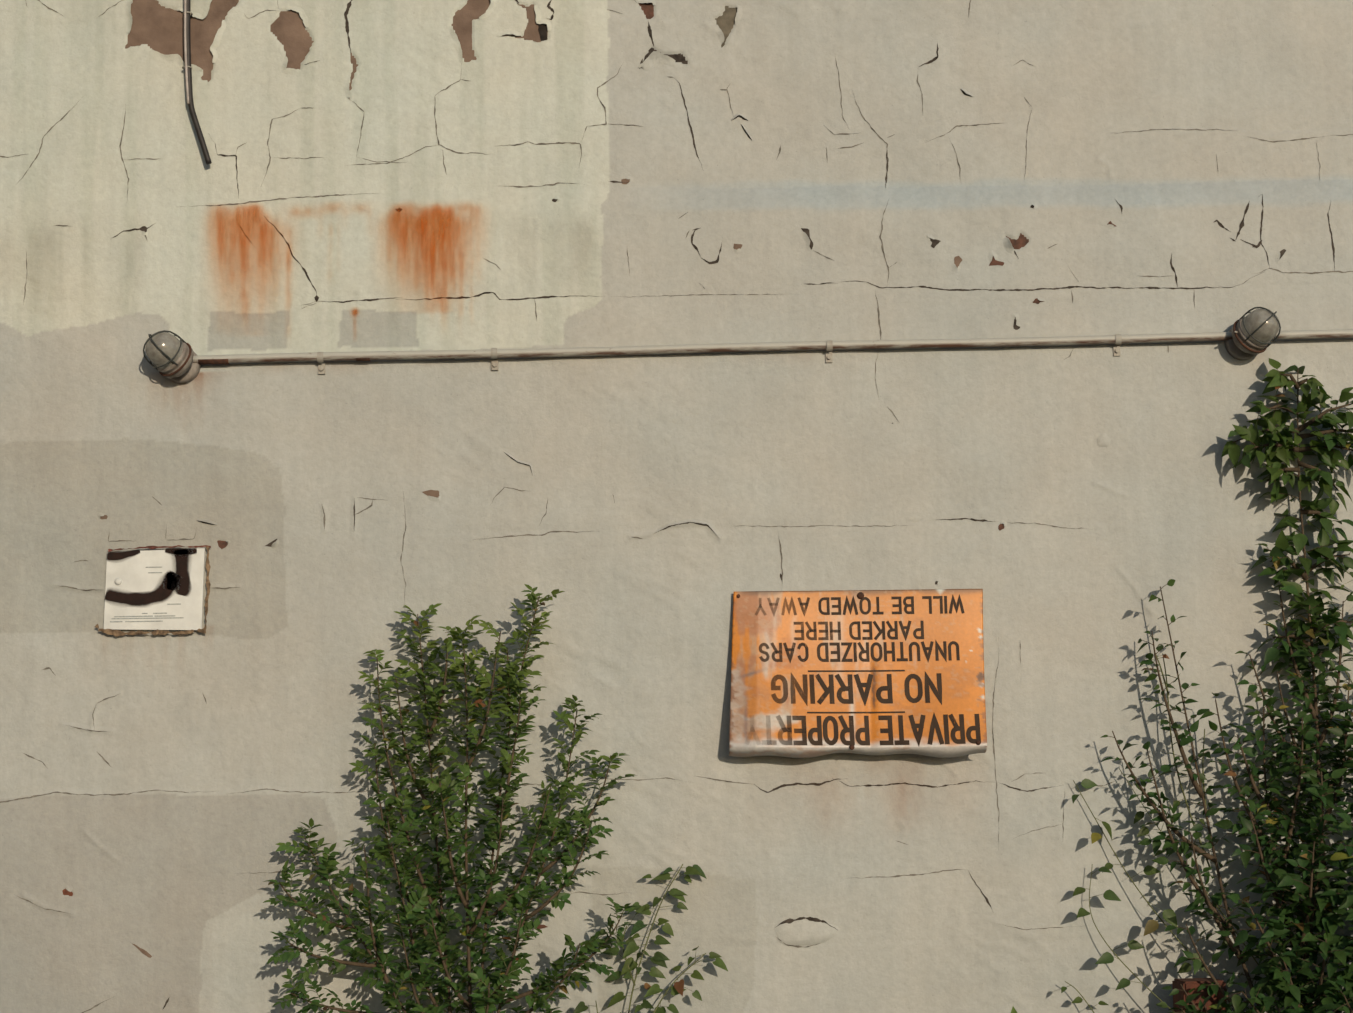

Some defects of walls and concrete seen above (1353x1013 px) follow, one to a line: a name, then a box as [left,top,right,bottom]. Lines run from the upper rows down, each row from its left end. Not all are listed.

peeling [125,0,239,82]
peeling [270,6,314,74]
peeling [449,0,497,65]
peeling [497,0,554,42]
peeling [715,5,743,48]
crack [0,101,79,181]
crack [119,108,155,194]
crack [181,0,776,321]
crack [113,224,154,240]
peeling [989,233,1029,266]
crack [808,43,1353,422]
crack [589,644,1065,842]